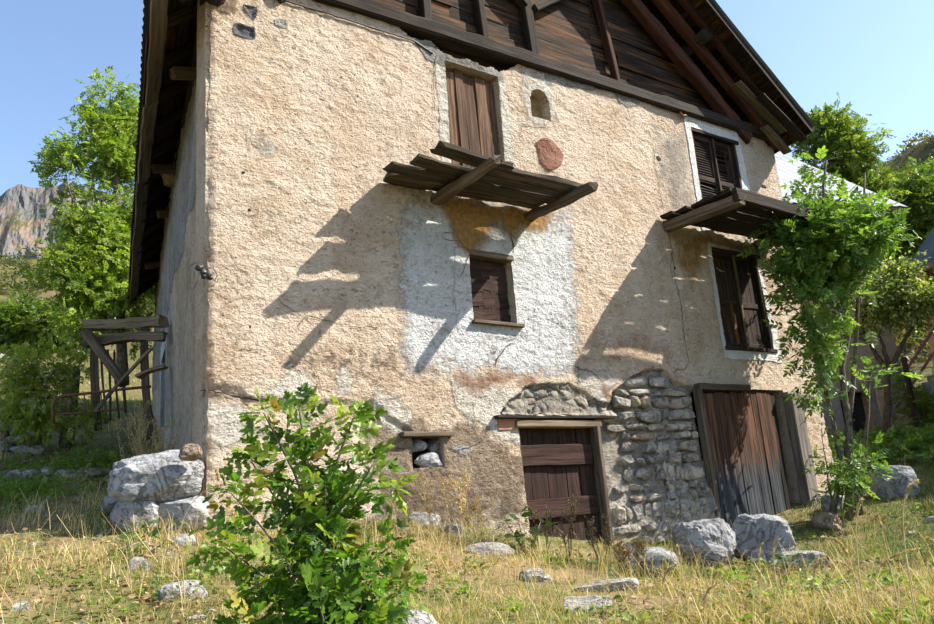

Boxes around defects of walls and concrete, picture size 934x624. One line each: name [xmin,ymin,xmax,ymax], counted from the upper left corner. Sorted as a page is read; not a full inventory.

damp [442,198,548,253]
crack [279,300,380,330]
crack [668,233,689,377]
peeling [202,396,248,447]